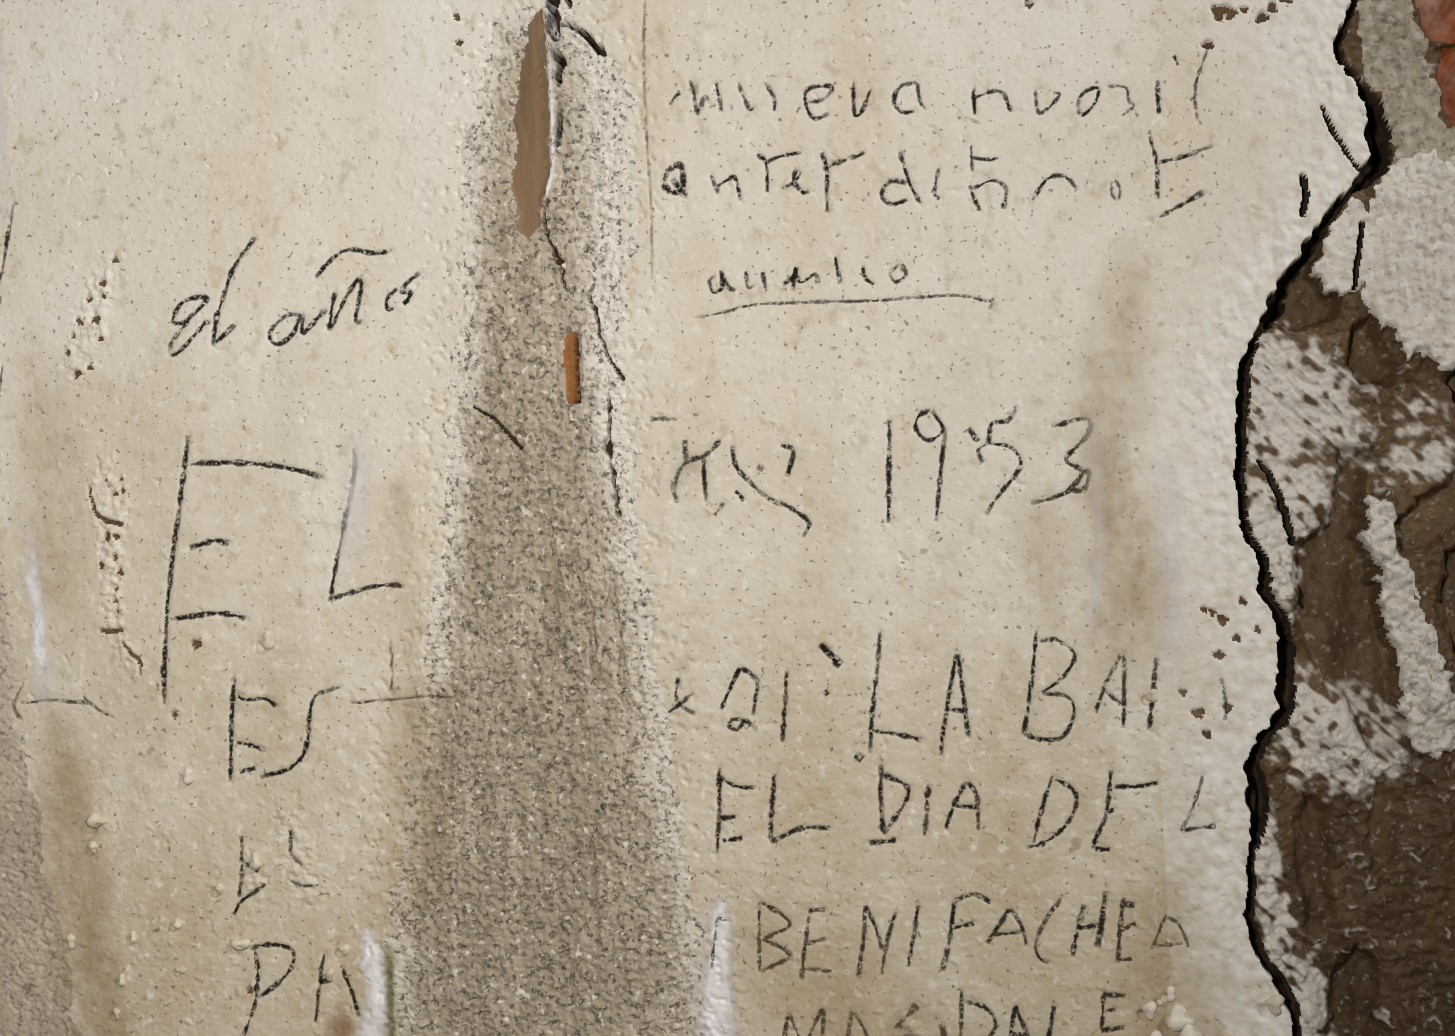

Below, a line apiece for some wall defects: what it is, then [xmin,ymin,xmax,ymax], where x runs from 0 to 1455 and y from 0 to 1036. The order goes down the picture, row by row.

crack [546,0,607,147]
spalling [1211,0,1293,24]
crack [544,201,625,517]
spalling [382,0,707,1036]
spalling [1243,0,1455,1036]
spalling [1200,596,1261,660]
spalling [1178,690,1211,739]